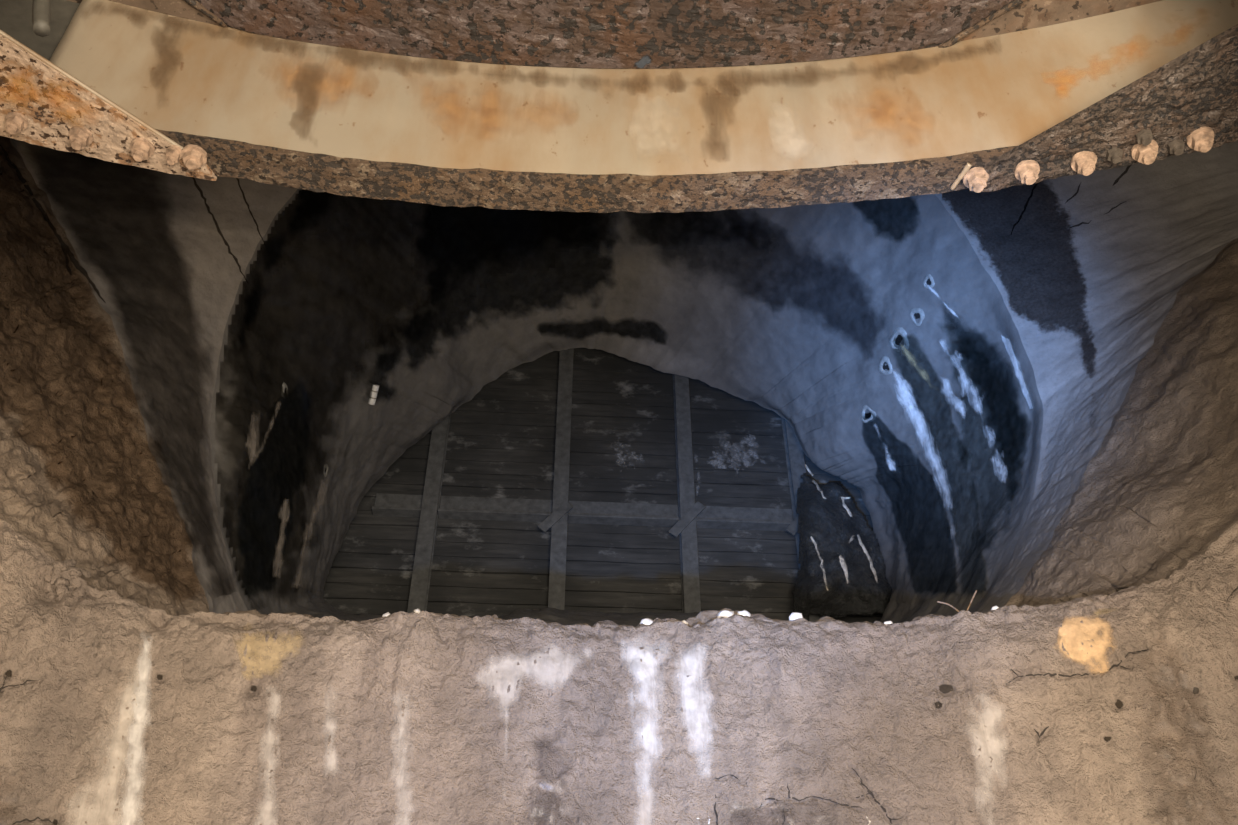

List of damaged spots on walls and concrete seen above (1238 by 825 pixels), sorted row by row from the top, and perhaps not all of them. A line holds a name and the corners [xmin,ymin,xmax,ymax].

corrosion [890,56,922,70]
corrosion [298,70,318,122]
corrosion [708,71,817,149]
damp [854,197,917,239]
damp [941,181,1096,376]
damp [24,142,615,595]
damp [863,286,1033,593]
damp [481,649,573,705]
crack [1008,649,1149,683]
damp [77,645,148,825]
crack [714,775,739,825]
crack [758,768,901,824]